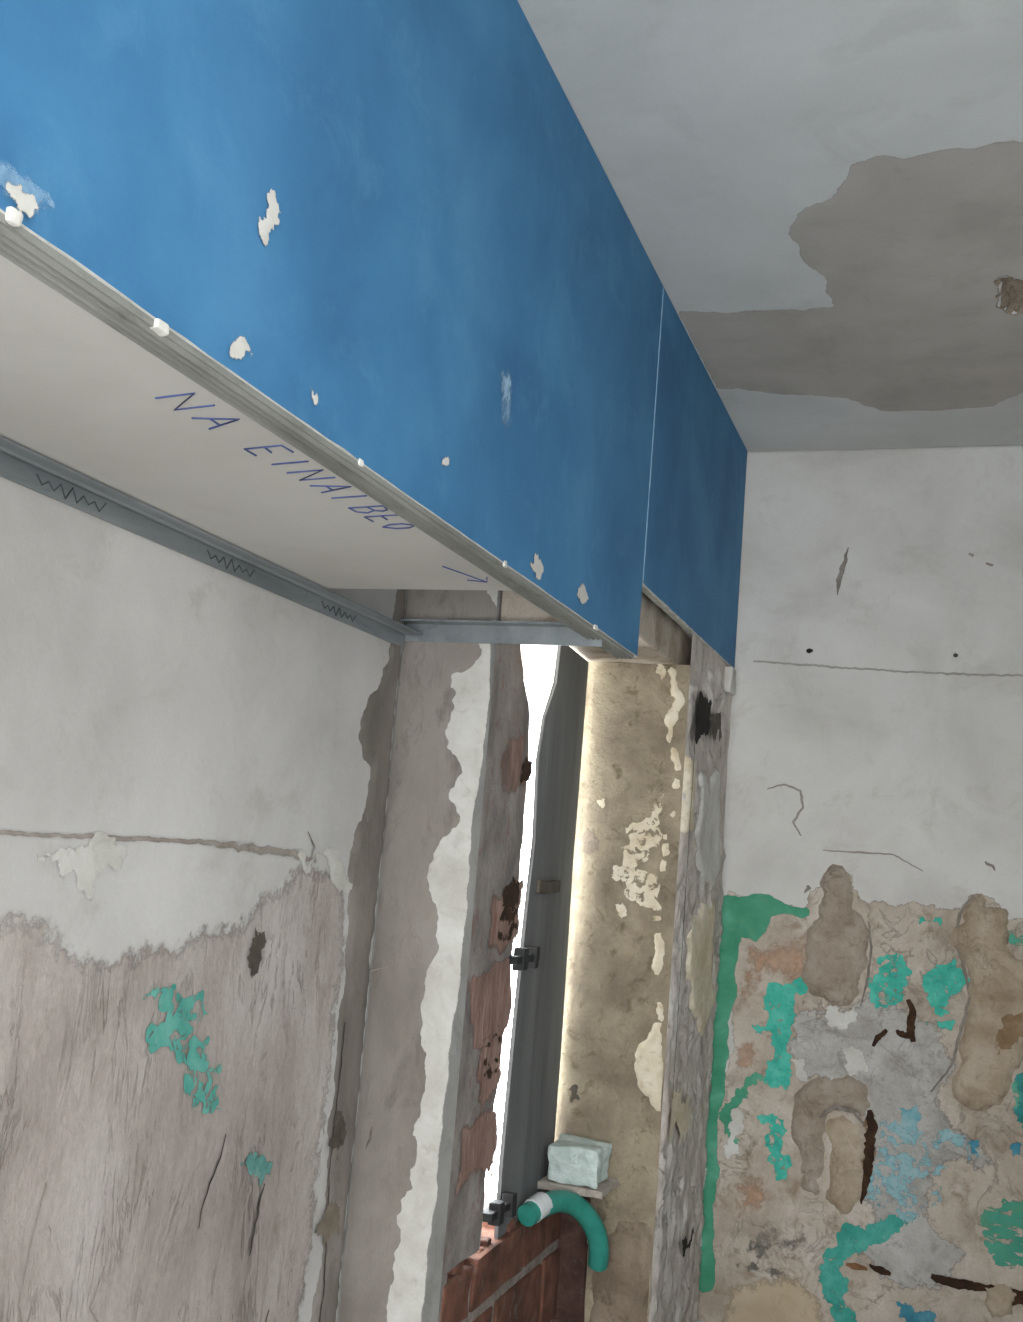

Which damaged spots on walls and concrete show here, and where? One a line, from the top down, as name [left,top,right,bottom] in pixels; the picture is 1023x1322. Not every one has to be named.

peeling [679,141,1023,411]
flaking render [501,735,534,793]
crack [0,830,316,863]
flaking render [455,876,524,1196]
flaking render [612,664,1023,1322]
flaking render [0,847,353,1322]
crack [328,1022,346,1205]
peeling [569,1084,580,1102]
crack [199,1134,226,1228]
crack [249,1183,265,1256]
crack [319,1241,327,1322]
crack [1012,1295,1023,1306]